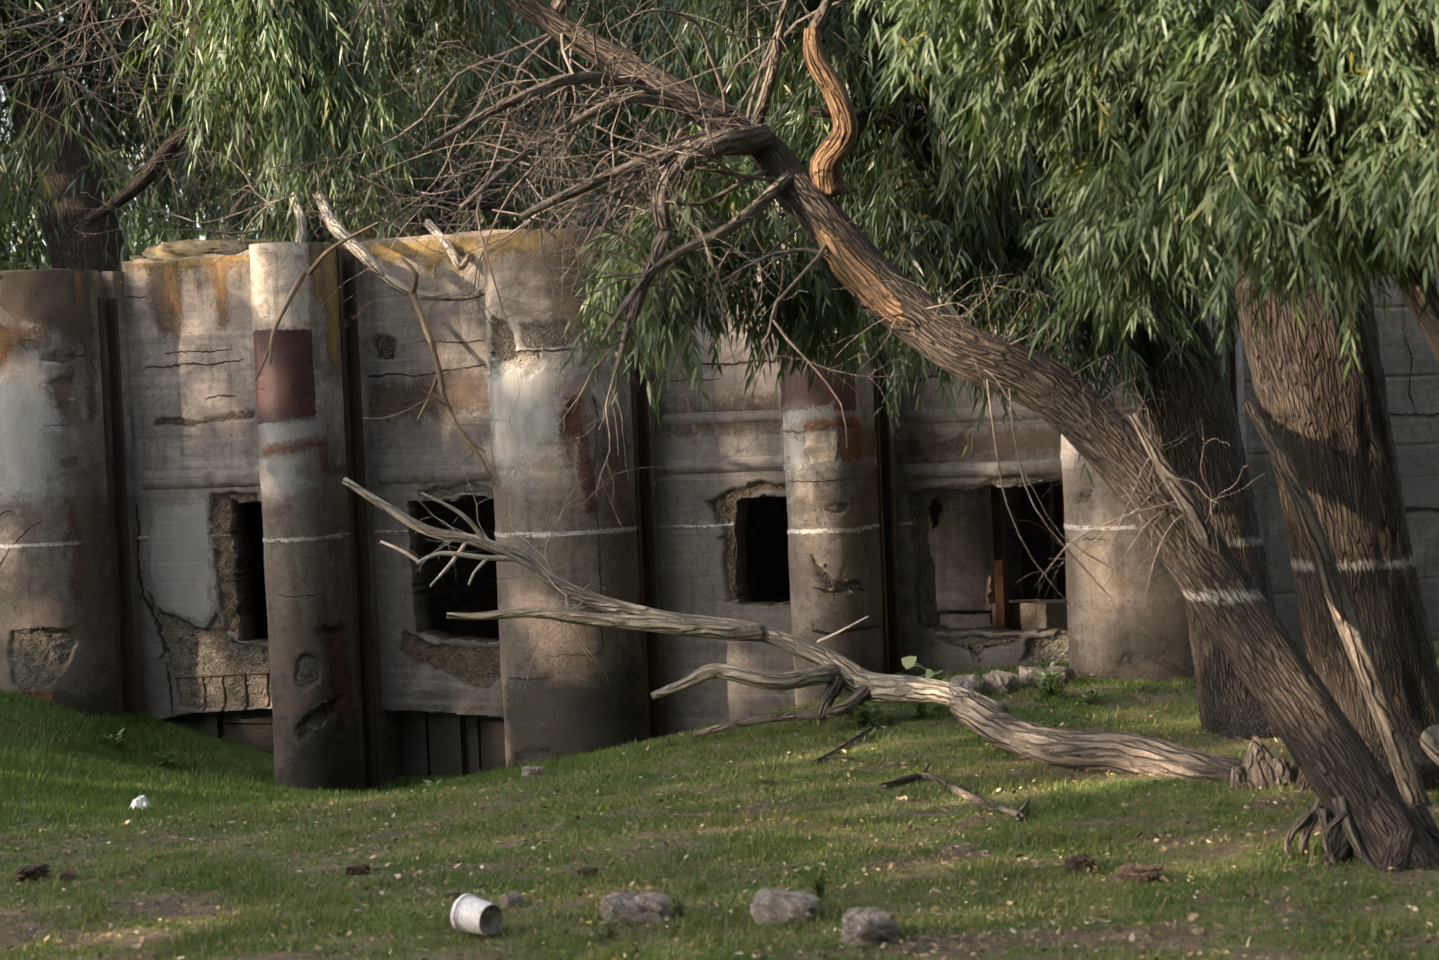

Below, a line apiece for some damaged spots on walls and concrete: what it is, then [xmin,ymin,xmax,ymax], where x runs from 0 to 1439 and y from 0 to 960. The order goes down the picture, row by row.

rust [159,258,233,328]
rust [0,323,36,366]
spalling [487,313,572,377]
rust [263,435,329,471]
crack [1405,505,1439,513]
crack [135,503,173,716]
spalling [7,625,75,694]
spalling [938,633,1069,665]